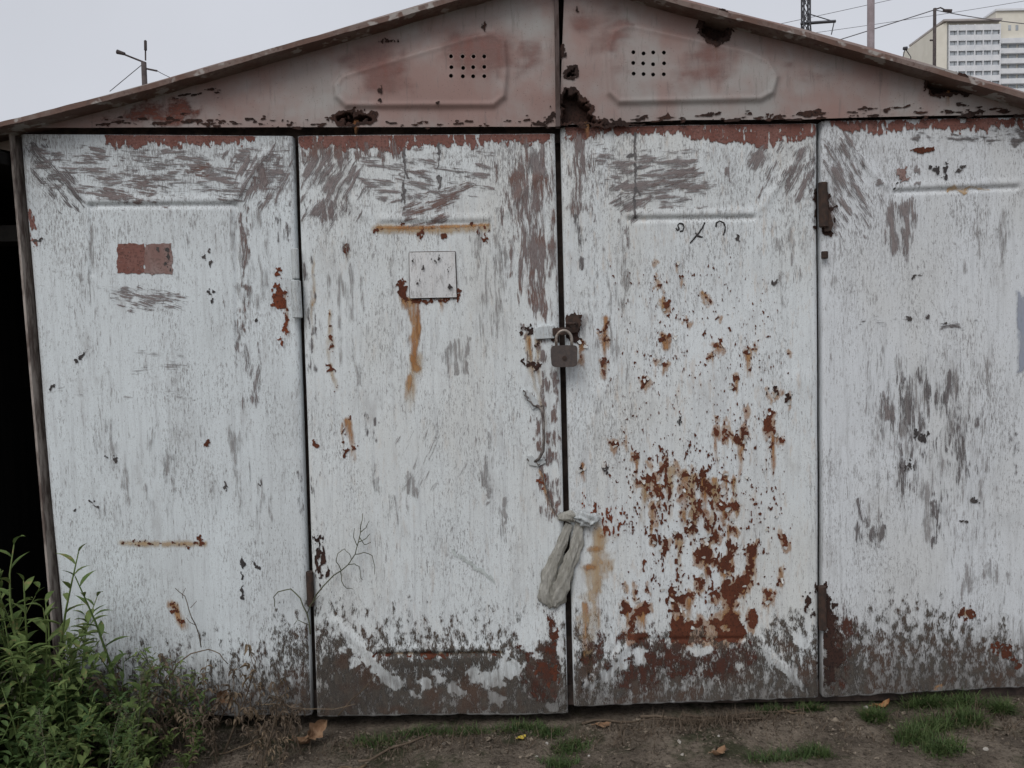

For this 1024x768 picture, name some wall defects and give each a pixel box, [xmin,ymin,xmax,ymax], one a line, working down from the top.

rust [373,222,490,242]
rust [270,267,289,346]
rust [395,278,462,390]
peeling [24,124,1024,551]
rust [515,312,610,376]
rust [120,534,206,550]
rust [582,386,793,649]
rust [168,601,185,628]
rust [534,616,560,688]
rust [802,581,846,688]
rust [958,605,976,621]
rust [990,639,1022,670]